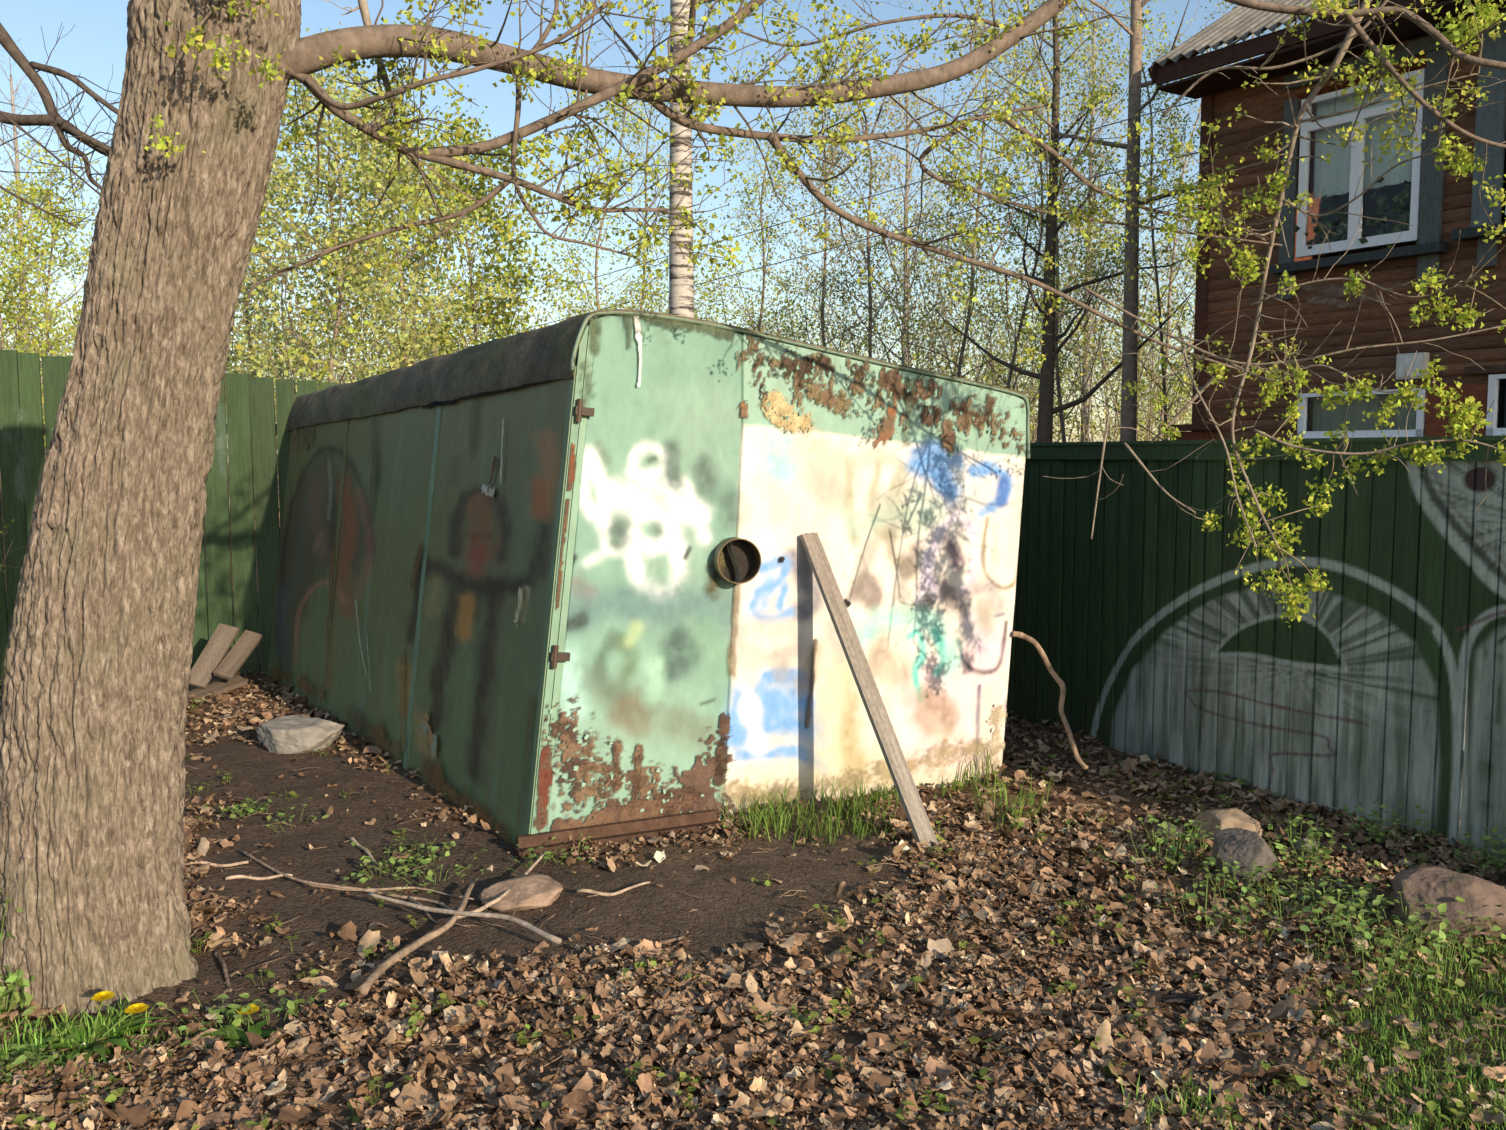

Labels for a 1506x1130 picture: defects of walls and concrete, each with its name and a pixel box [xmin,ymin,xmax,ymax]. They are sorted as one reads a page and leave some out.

rust [739,371,768,418]
rust [781,348,1007,457]
rust [416,760,510,844]
rust [533,712,734,831]